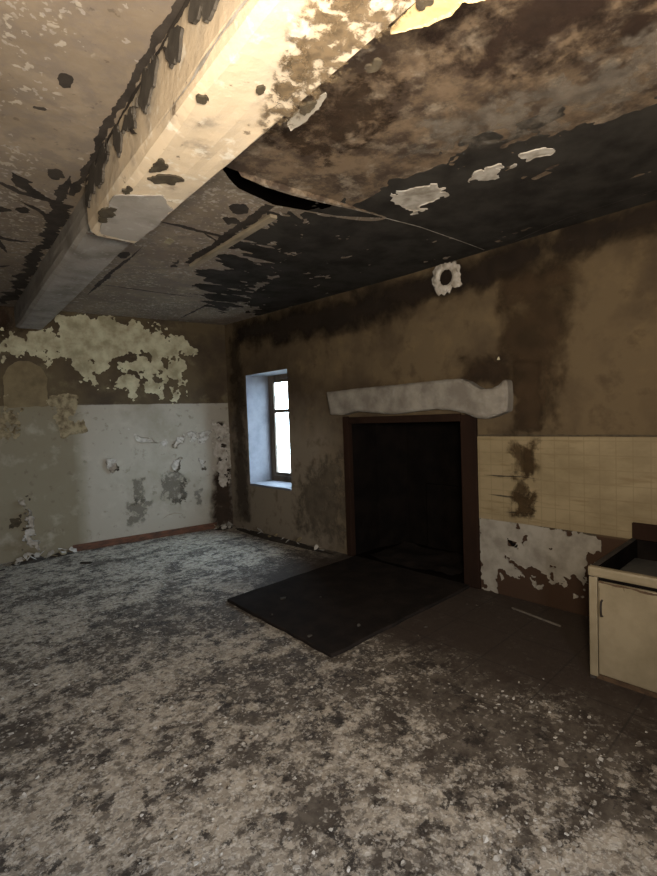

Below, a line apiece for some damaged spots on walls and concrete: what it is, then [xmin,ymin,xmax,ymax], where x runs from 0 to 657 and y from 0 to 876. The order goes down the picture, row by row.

leakage [260,0,411,166]
leakage [417,0,657,152]
peeling [0,0,220,304]
crack [162,222,232,243]
peeling [46,393,88,439]
peeling [0,314,198,405]
leakage [514,361,542,430]
leakage [510,441,538,517]
peeling [18,495,41,551]
peeling [479,518,602,599]